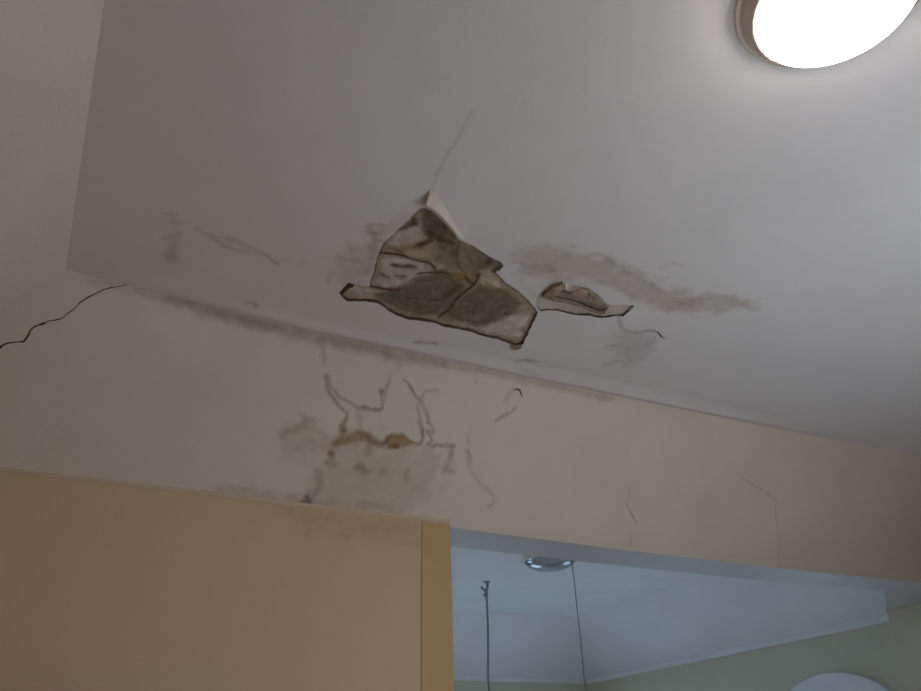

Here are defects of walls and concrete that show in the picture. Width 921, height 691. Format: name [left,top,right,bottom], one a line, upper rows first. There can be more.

peeling [426,190,464,239]
peeling [491,260,503,273]
crack [0,285,126,349]
leakage [386,436,412,446]